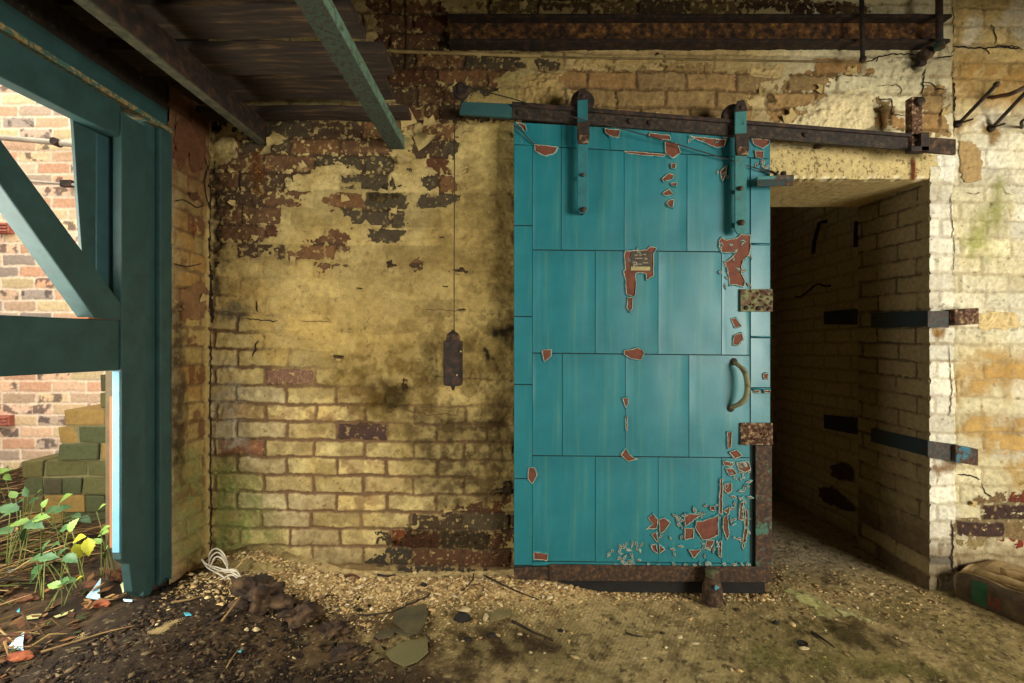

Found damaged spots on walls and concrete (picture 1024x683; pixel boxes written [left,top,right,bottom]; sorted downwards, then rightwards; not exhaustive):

crack [867,7,1023,129]
peeling [174,0,875,274]
peeling [872,96,905,131]
peeling [922,84,952,138]
corrosion [750,290,774,311]
peeling [365,481,514,573]
peeling [949,482,1024,550]